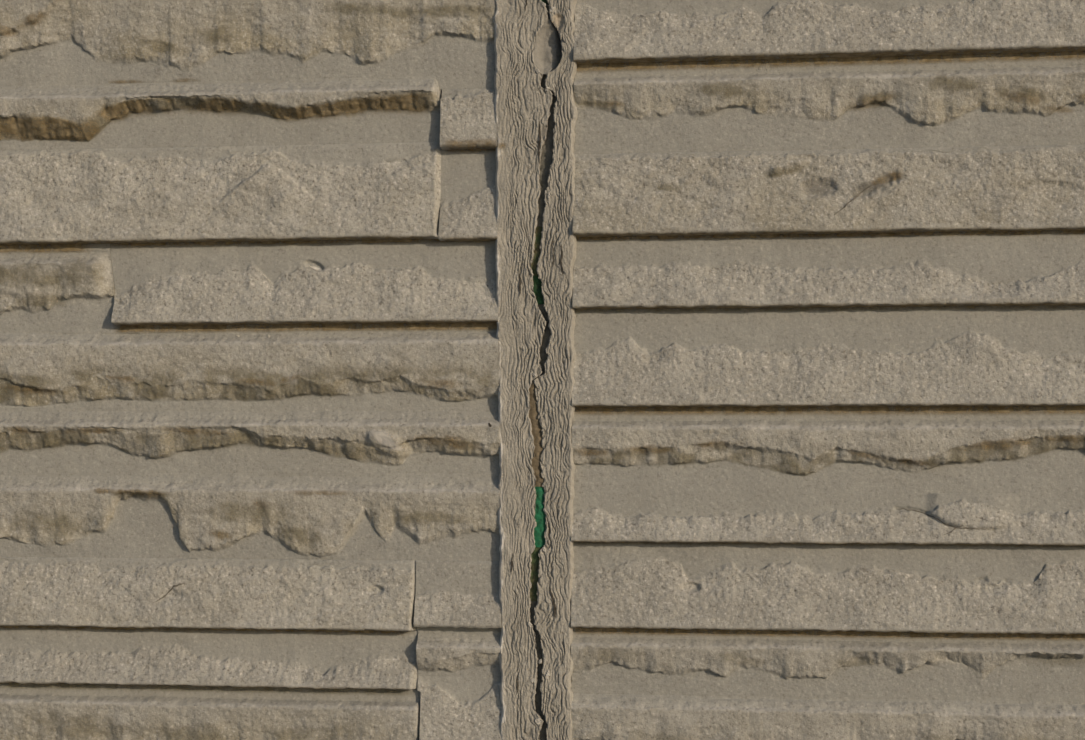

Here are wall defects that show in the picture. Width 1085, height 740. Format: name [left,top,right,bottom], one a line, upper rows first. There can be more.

crack [525,0,556,19]
crack [510,69,563,740]